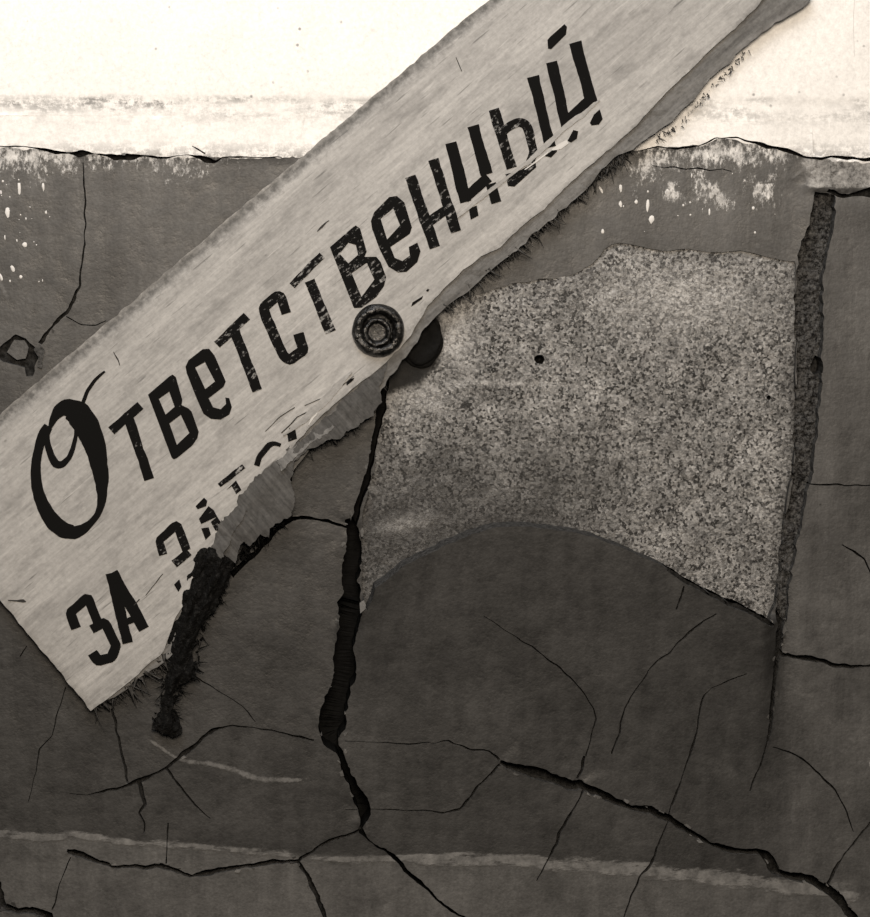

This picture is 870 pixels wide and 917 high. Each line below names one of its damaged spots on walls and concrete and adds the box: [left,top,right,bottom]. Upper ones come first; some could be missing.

crack [0,146,282,345]
spalling [360,243,797,621]
crack [0,378,870,917]